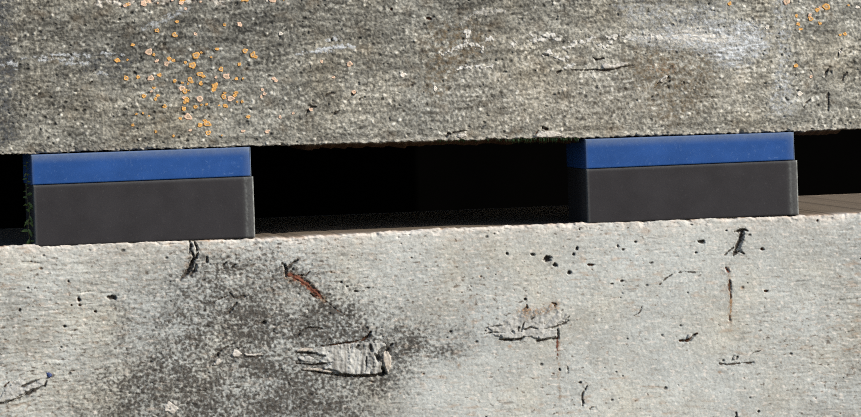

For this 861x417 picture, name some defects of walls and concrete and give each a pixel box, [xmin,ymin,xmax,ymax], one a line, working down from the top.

crack [542,54,635,74]
crack [180,241,235,281]
crack [724,229,748,256]
rust [281,259,348,317]
damp [81,254,454,417]
spalling [295,331,392,378]
spalling [484,302,570,356]